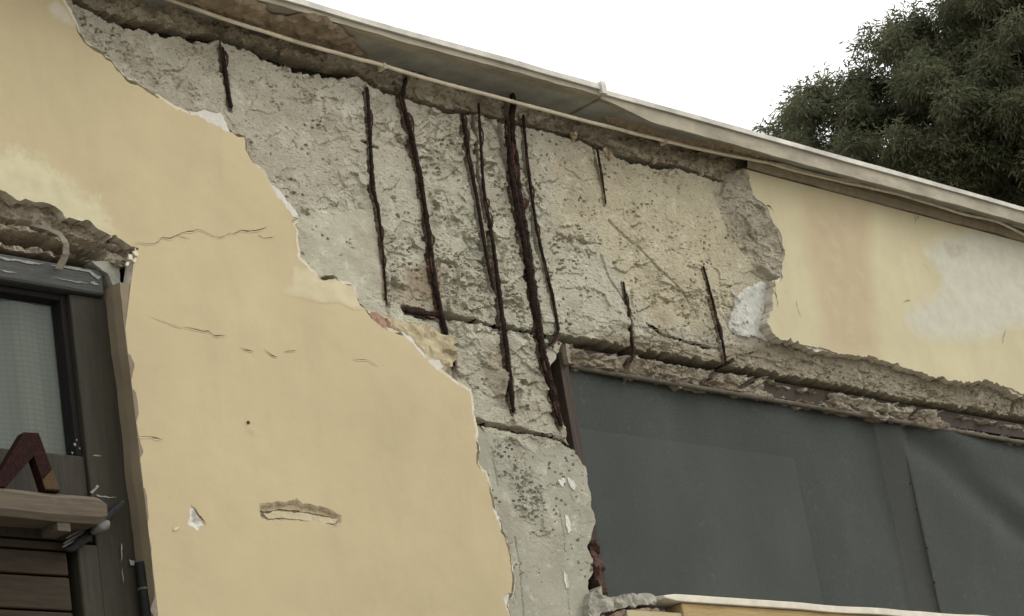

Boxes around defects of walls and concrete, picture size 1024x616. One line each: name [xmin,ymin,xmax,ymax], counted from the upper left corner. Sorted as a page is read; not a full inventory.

peeling [0,134,141,267]
crack [133,226,272,246]
crack [152,317,295,358]
spalling [63,0,666,616]
rust [365,87,388,306]
rust [392,76,449,335]
rust [461,102,515,416]
crack [477,423,571,447]
rust [502,93,648,441]
rust [663,266,727,371]
spalling [515,100,1024,446]